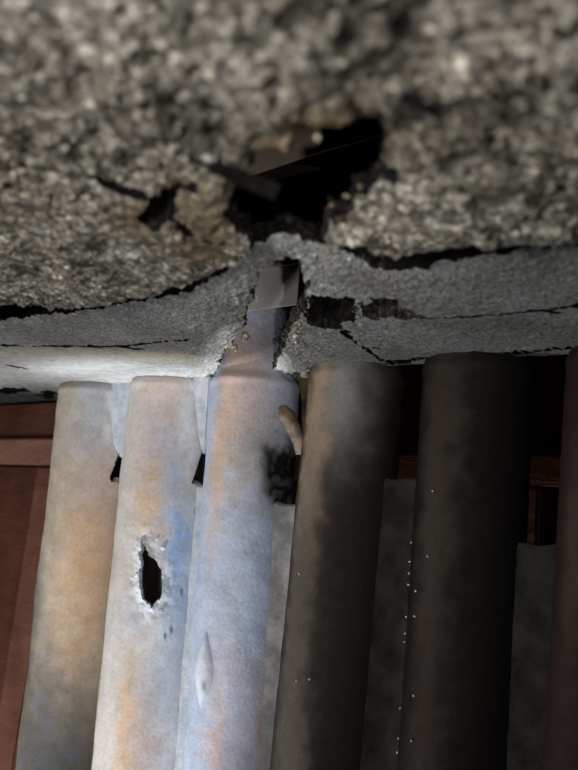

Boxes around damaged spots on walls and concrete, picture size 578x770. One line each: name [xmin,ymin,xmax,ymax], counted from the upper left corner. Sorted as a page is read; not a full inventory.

hole [136,182,181,233]
crack [391,244,578,271]
crack [0,280,197,321]
spalling [303,294,427,330]
crack [424,303,578,320]
crack [1,339,190,367]
crack [340,330,427,365]
crack [503,346,575,355]